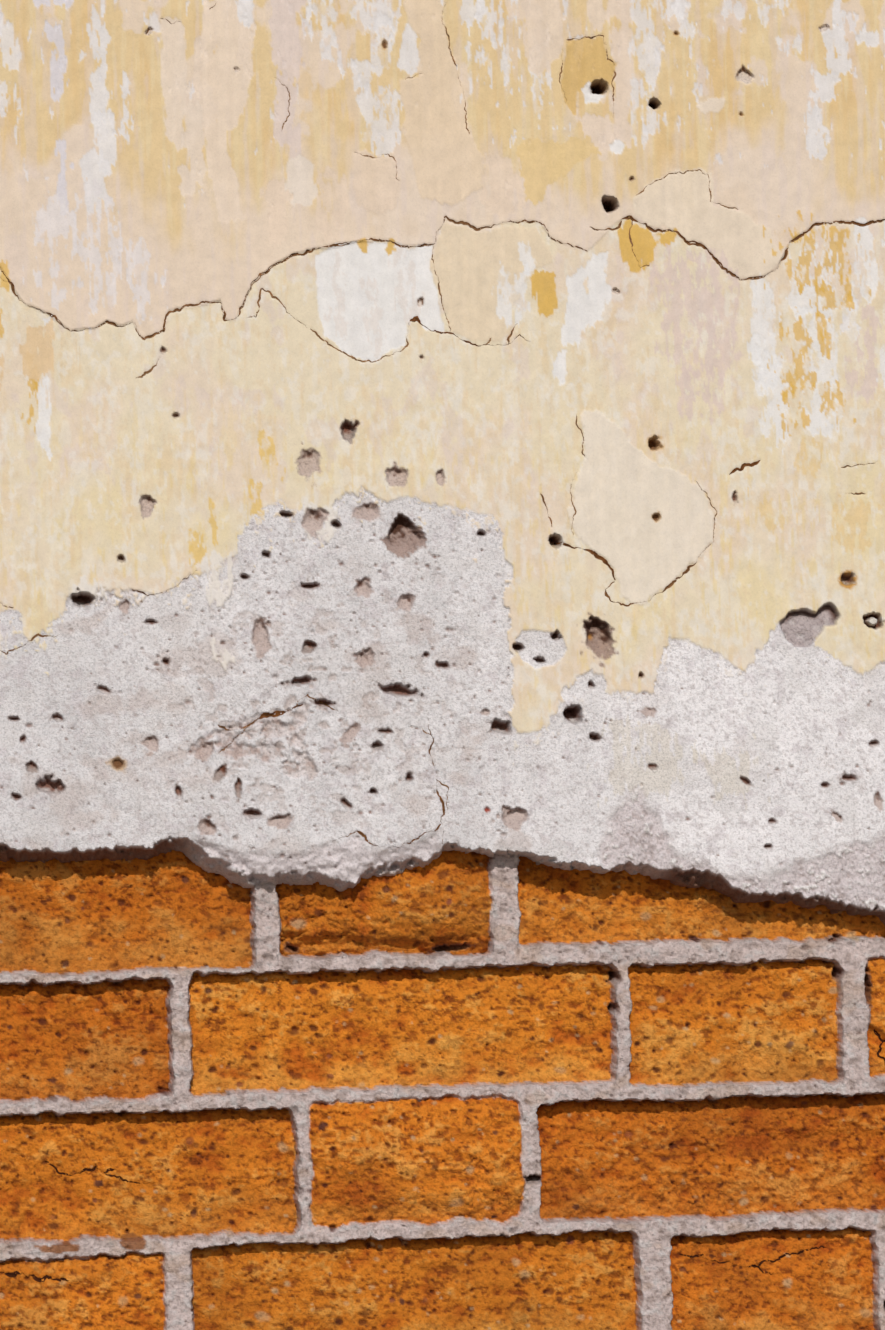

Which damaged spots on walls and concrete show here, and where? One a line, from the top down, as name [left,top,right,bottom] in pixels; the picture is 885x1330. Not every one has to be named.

peeling [145,0,694,364]
crack [0,169,885,378]
peeling [551,250,621,394]
spalling [295,441,325,489]
peeling [568,411,717,608]
crack [540,460,760,606]
flaking render [0,461,885,925]
spalling [867,961,885,1078]